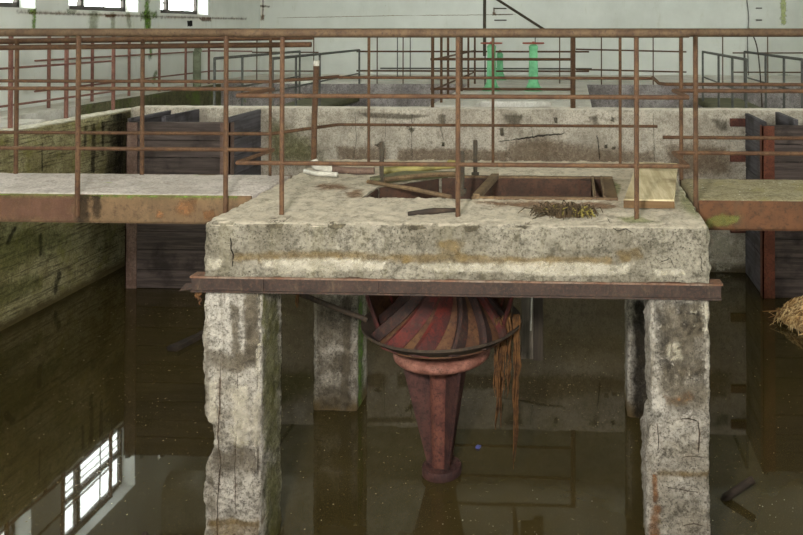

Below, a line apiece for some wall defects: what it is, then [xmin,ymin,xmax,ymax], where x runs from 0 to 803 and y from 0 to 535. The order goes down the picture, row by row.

crack [498,133,564,142]
corrosion [0,195,102,223]
leakage [210,293,262,371]
crack [216,369,238,535]
corrosion [650,474,661,535]